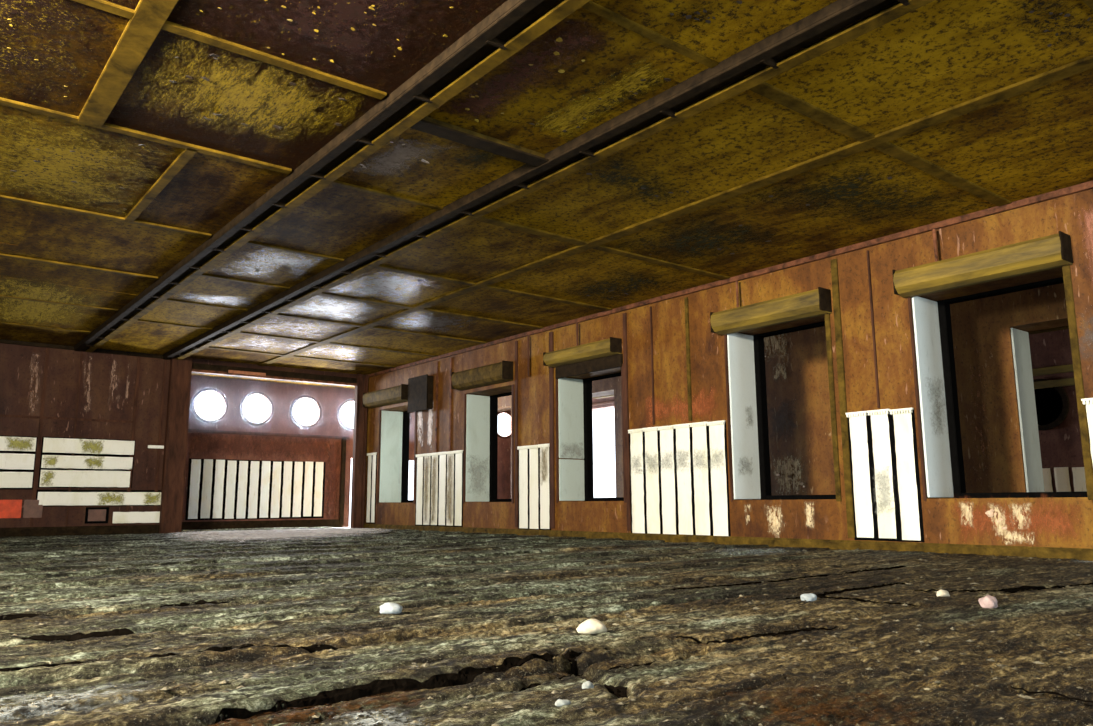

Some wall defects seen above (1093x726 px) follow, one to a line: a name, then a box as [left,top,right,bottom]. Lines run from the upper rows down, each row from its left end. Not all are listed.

water stain [752,157,972,224]
peeling [961,503,1034,544]
crack [159,600,226,608]
crack [0,613,134,672]
crack [148,644,337,657]
crack [214,648,655,726]